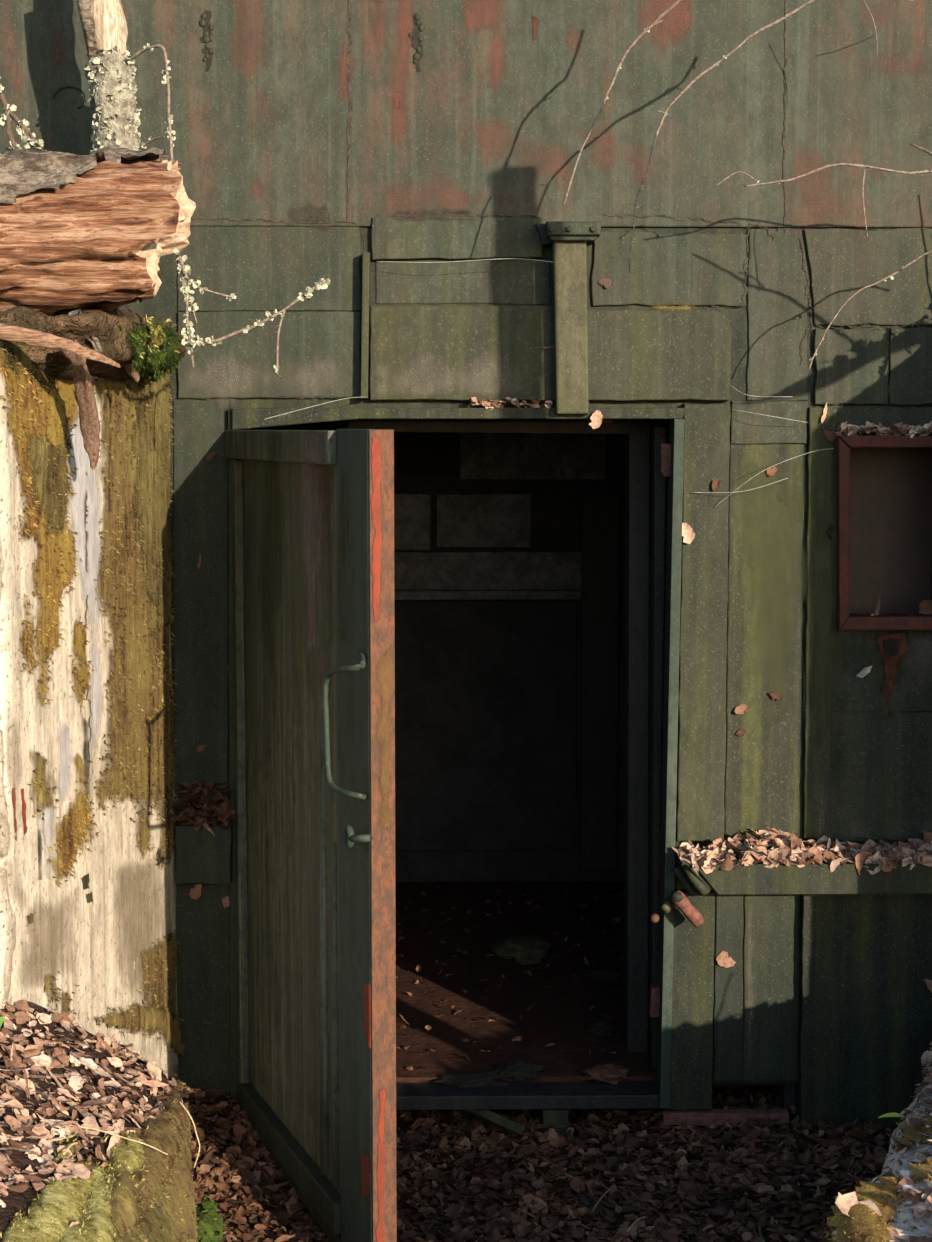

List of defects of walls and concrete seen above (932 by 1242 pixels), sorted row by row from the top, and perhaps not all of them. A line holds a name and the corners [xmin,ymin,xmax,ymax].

damp [38,404,102,873]
rust [377,648,393,828]